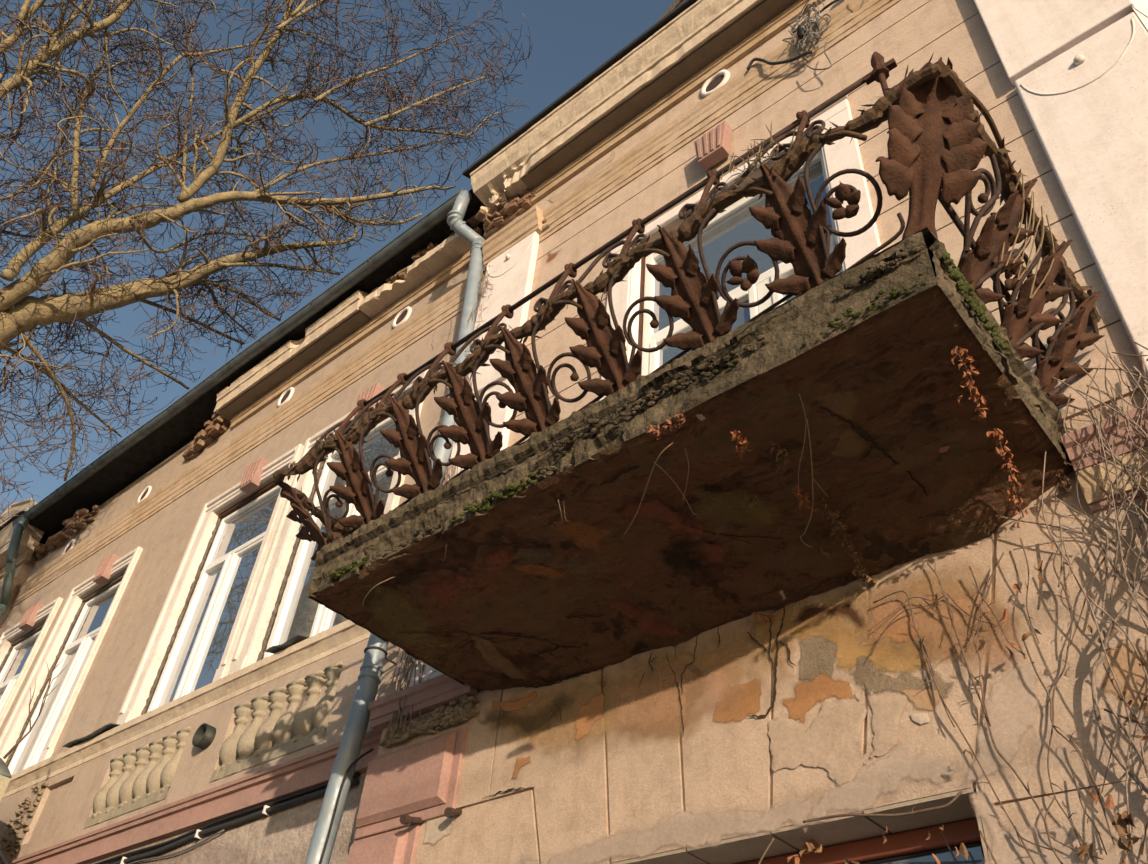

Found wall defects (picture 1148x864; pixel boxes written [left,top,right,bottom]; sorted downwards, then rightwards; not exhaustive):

crack [820,407,929,496]
crack [399,631,607,721]
crack [639,627,720,736]
crack [747,606,796,718]
peeling [549,599,1086,864]